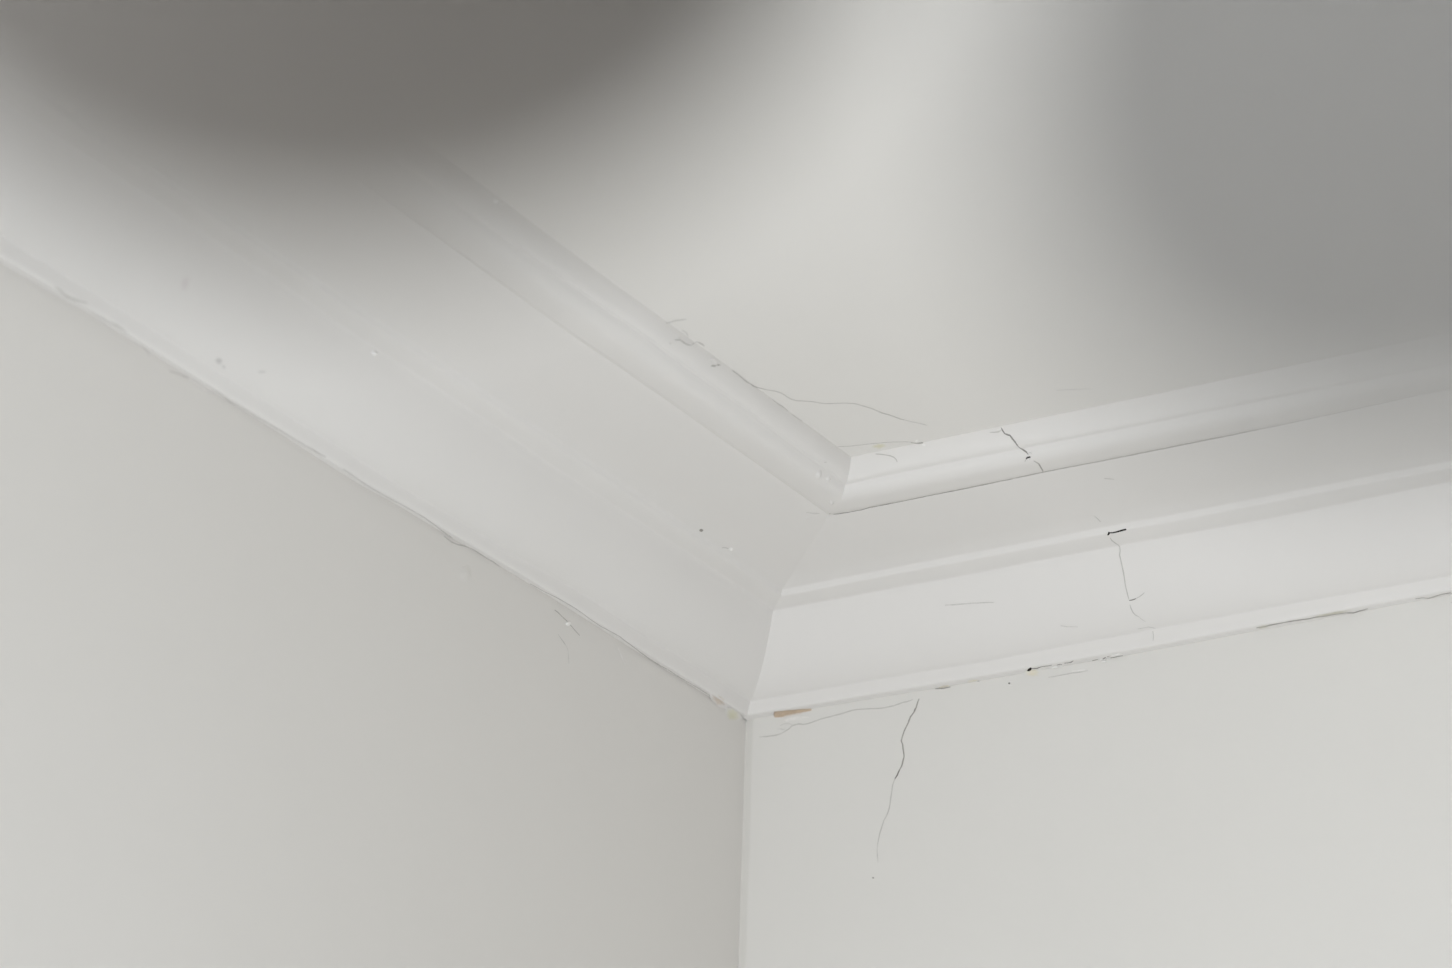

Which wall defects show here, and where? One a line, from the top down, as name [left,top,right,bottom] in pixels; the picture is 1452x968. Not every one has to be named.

crack [733,371,925,425]
crack [829,427,1244,515]
crack [1097,518,1154,639]
crack [762,699,919,860]